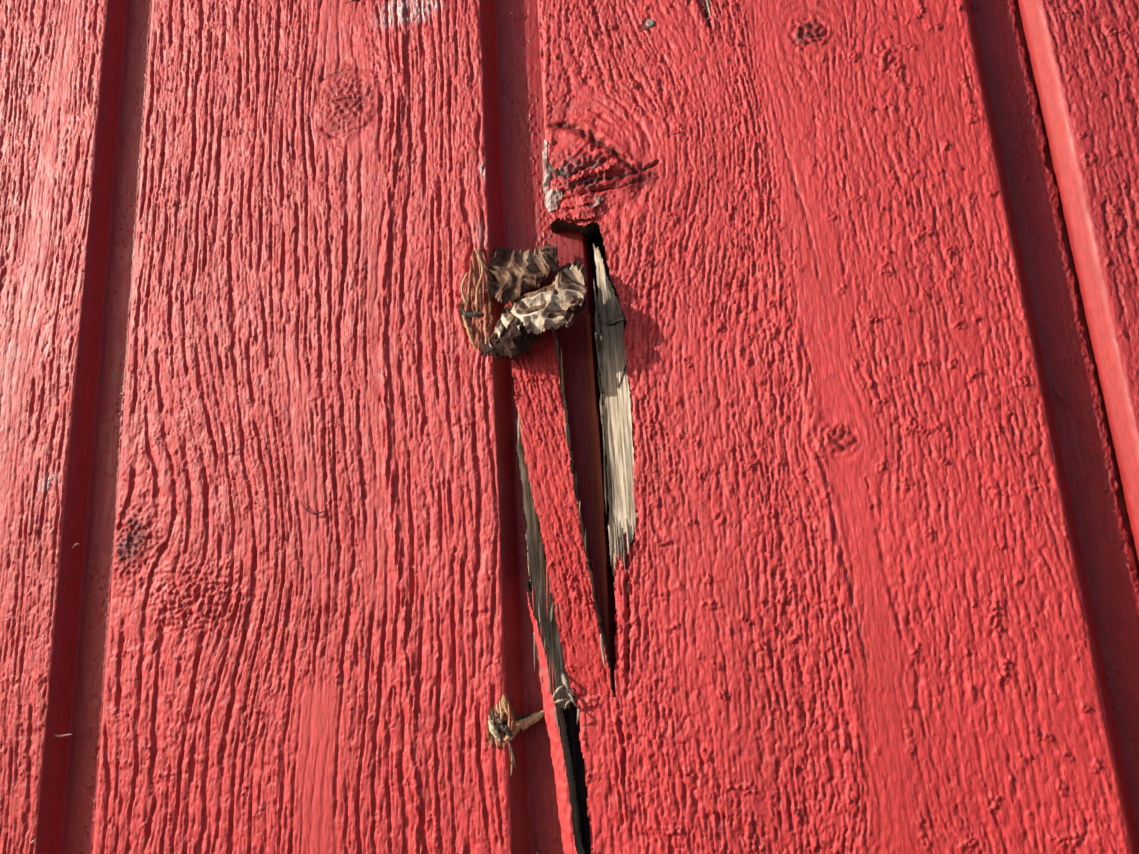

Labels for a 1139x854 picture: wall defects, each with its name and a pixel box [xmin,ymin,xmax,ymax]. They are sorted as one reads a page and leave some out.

spalling [511,244,638,854]
crack [617,547,630,820]